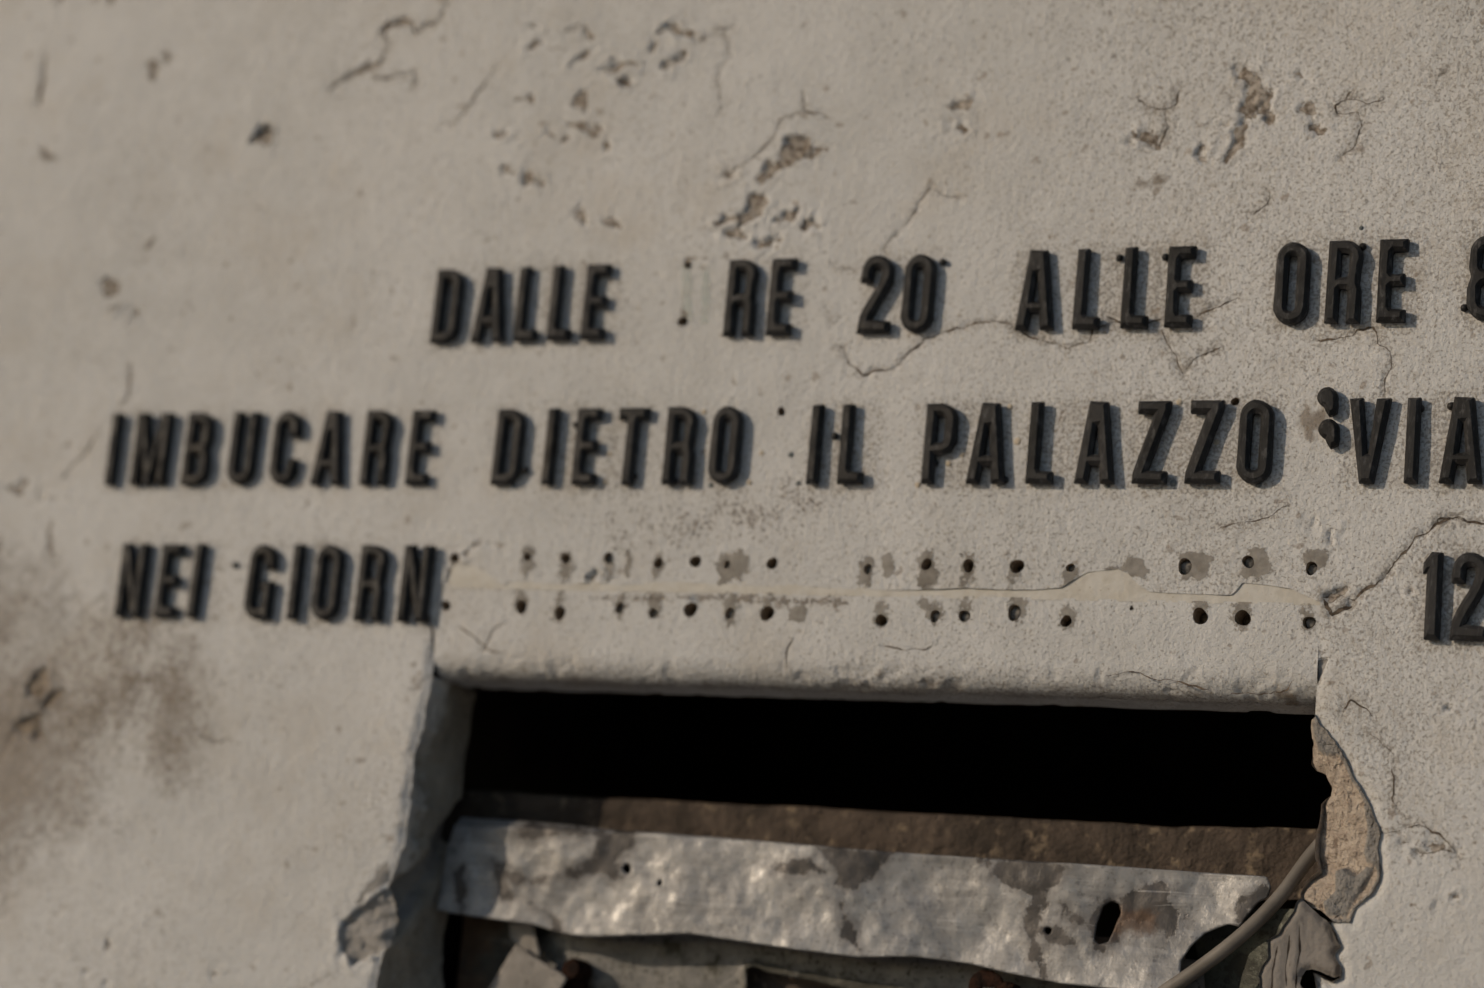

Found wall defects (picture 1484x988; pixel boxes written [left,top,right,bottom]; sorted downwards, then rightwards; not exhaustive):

crack [327,2,448,90]
spalling [714,135,828,249]
crack [830,316,1221,383]
crack [1197,297,1238,317]
crack [1323,516,1484,616]
spalling [1317,659,1328,685]
spalling [1300,717,1382,922]
spalling [338,890,397,965]